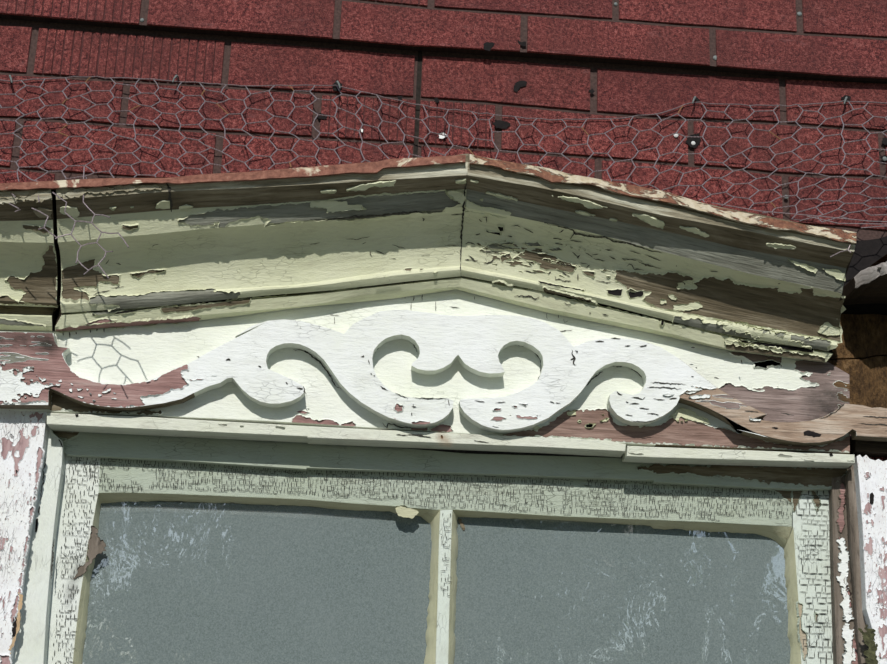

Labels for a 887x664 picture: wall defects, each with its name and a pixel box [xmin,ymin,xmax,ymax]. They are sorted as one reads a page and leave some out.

peeling [0,178,887,664]
crack [38,440,858,664]